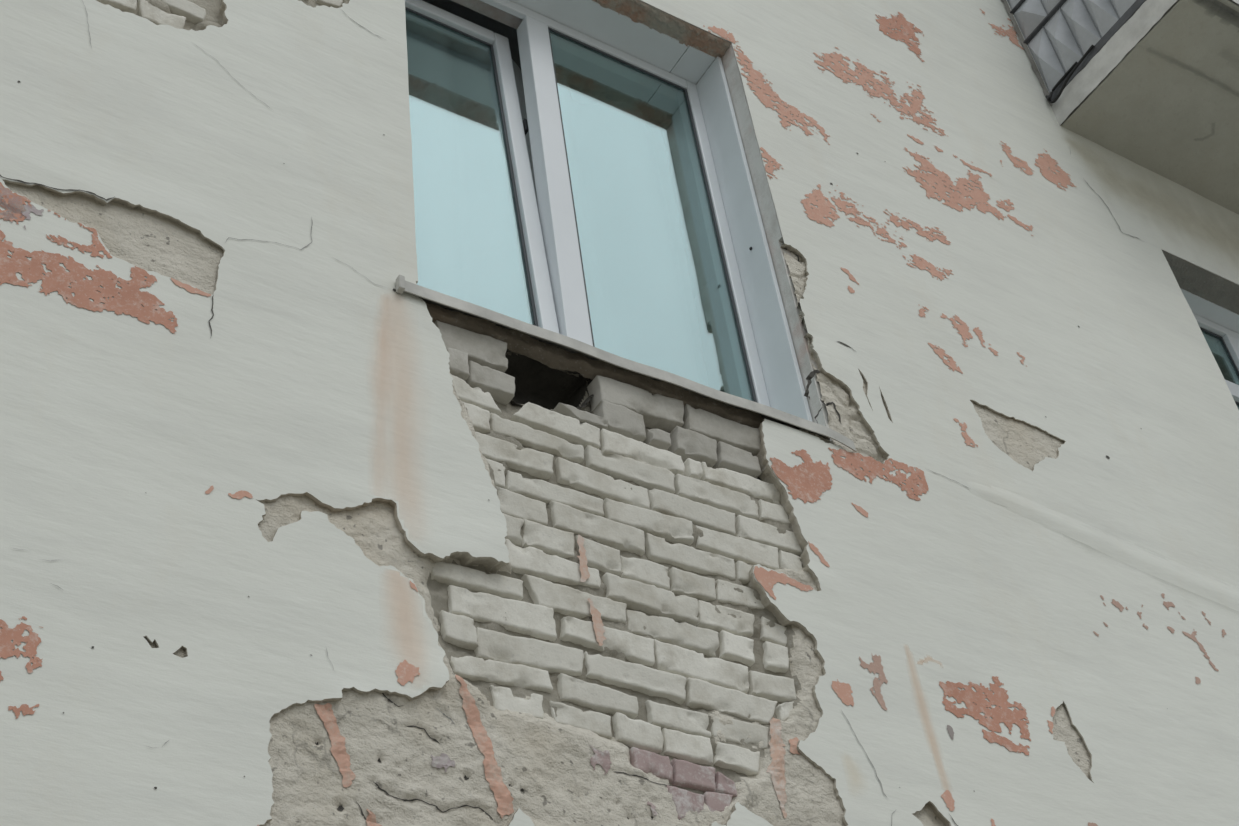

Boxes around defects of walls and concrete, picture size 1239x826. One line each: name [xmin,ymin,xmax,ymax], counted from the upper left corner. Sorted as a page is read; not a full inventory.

flaking render [96,0,228,31]
flaking render [593,0,830,145]
peeling [813,47,1076,236]
flaking render [0,179,225,335]
crack [226,221,384,287]
peeling [800,183,954,280]
flaking render [954,400,1066,471]
flaking render [228,242,929,826]
peeling [0,616,43,680]
peeling [939,676,1031,755]
flaking render [1047,701,1094,783]
flaking render [912,790,955,826]